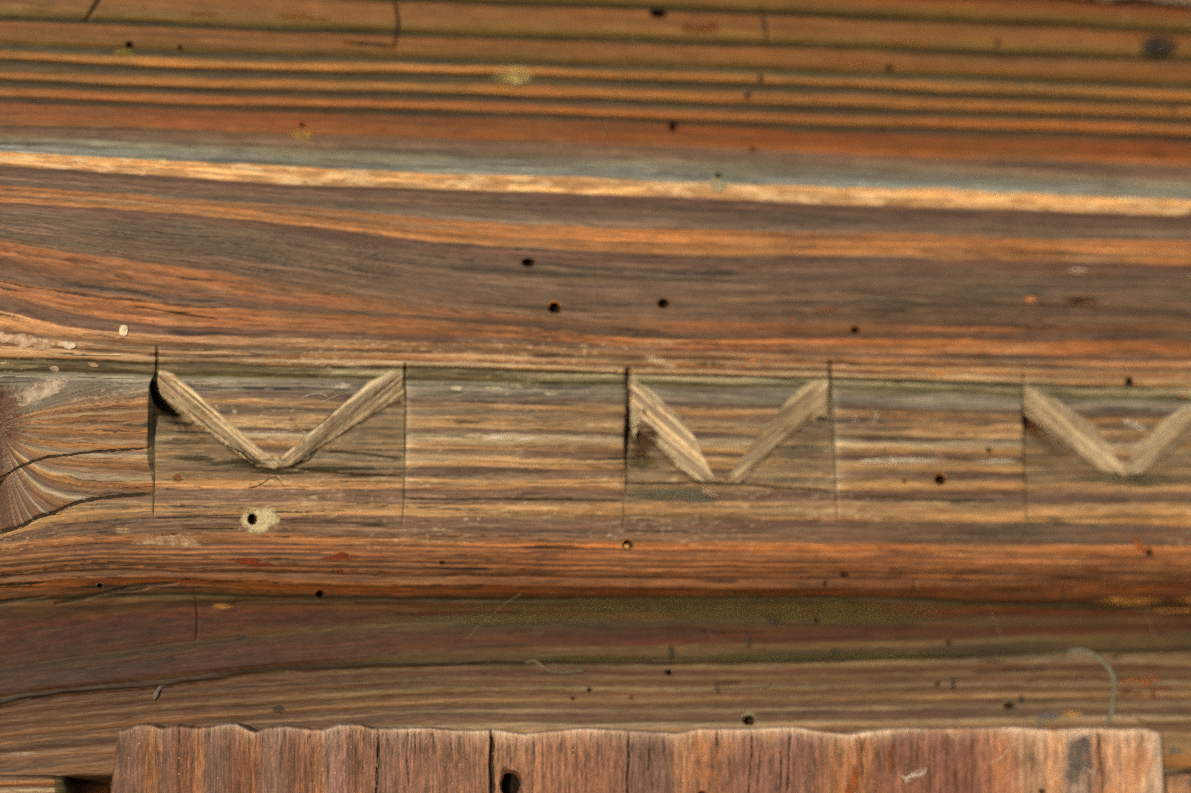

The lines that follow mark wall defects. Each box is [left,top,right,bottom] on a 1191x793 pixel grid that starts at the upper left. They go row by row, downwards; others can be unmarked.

crack [87,0,101,20]
crack [349,0,401,48]
crack [0,447,146,485]
crack [164,446,985,536]
crack [0,492,153,534]